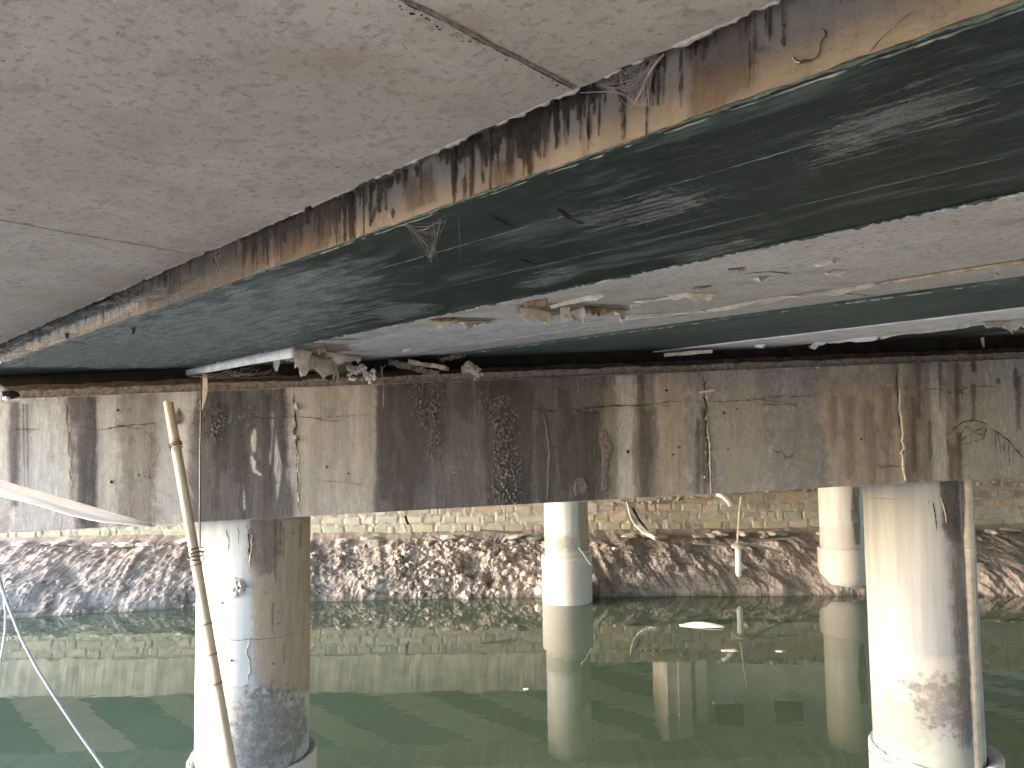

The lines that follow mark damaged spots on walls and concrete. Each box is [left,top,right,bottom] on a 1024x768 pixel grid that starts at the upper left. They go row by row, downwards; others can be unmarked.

peeling [273,347,361,381]
damp [336,313,647,362]
peeling [520,259,876,325]
damp [9,394,156,532]
crack [253,397,364,517]
crack [532,379,815,490]
damp [686,368,828,495]
damp [894,359,1024,746]